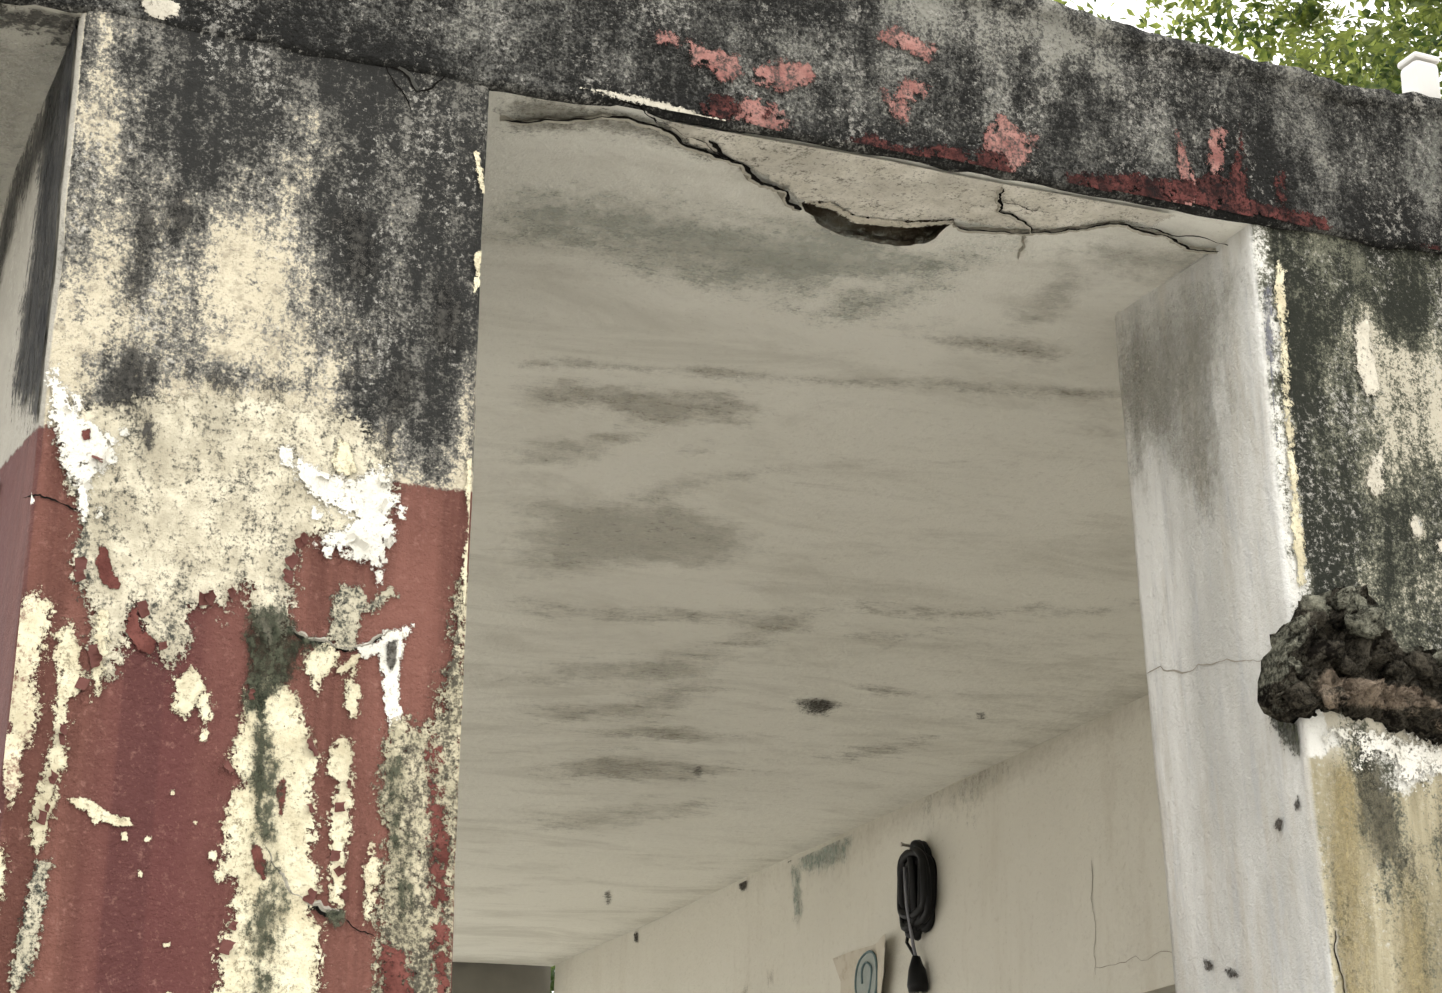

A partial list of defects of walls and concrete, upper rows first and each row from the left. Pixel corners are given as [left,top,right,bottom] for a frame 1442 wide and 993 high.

crack [500,99,802,212]
crack [952,187,1228,259]